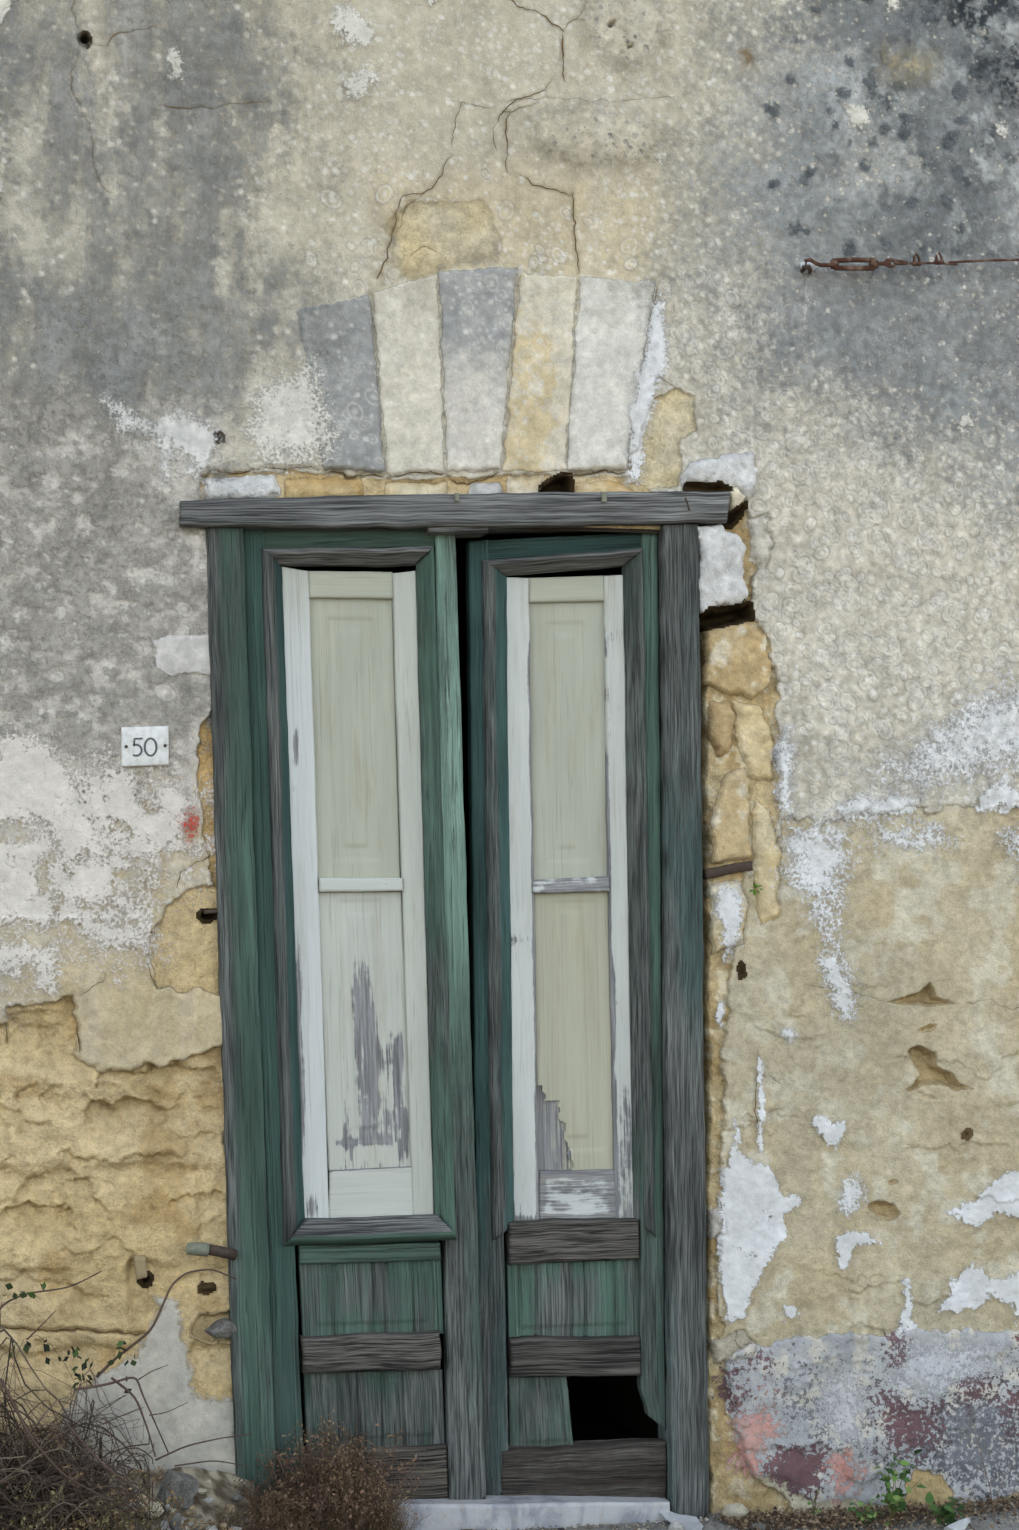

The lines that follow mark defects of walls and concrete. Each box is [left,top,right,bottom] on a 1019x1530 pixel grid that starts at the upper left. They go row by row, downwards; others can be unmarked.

damp [0,0,307,817]
spalling [96,351,553,500]
crack [377,0,661,278]
damp [672,0,1019,515]
spalling [0,692,233,1507]
flaking render [573,388,1019,1515]